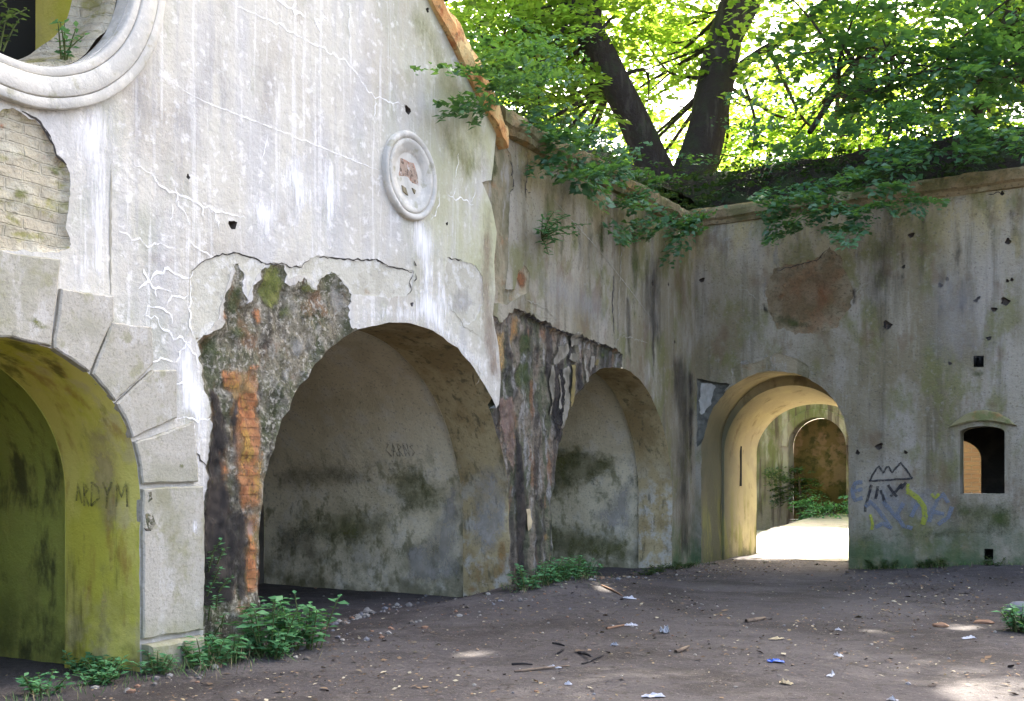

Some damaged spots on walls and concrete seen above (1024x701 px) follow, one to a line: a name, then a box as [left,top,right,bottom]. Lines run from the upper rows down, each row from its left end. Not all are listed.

flaking render [0,108,71,253]
crack [119,164,243,387]
crack [175,417,209,470]
spalling [189,252,413,659]
spalling [443,143,622,584]
spalling [696,353,810,447]